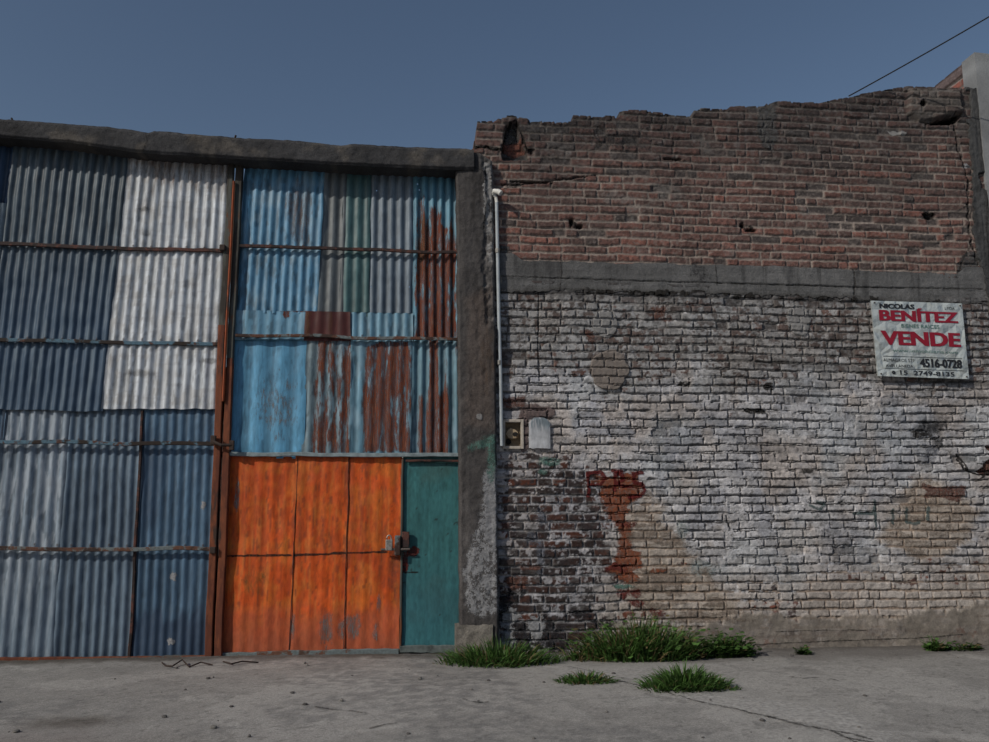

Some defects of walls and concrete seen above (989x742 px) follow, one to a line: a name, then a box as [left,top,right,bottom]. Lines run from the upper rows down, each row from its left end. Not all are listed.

crack [503,111,989,381]
spalling [976,446,989,474]
peeling [462,462,541,618]
flaking render [883,482,976,559]
peeling [564,609,614,627]